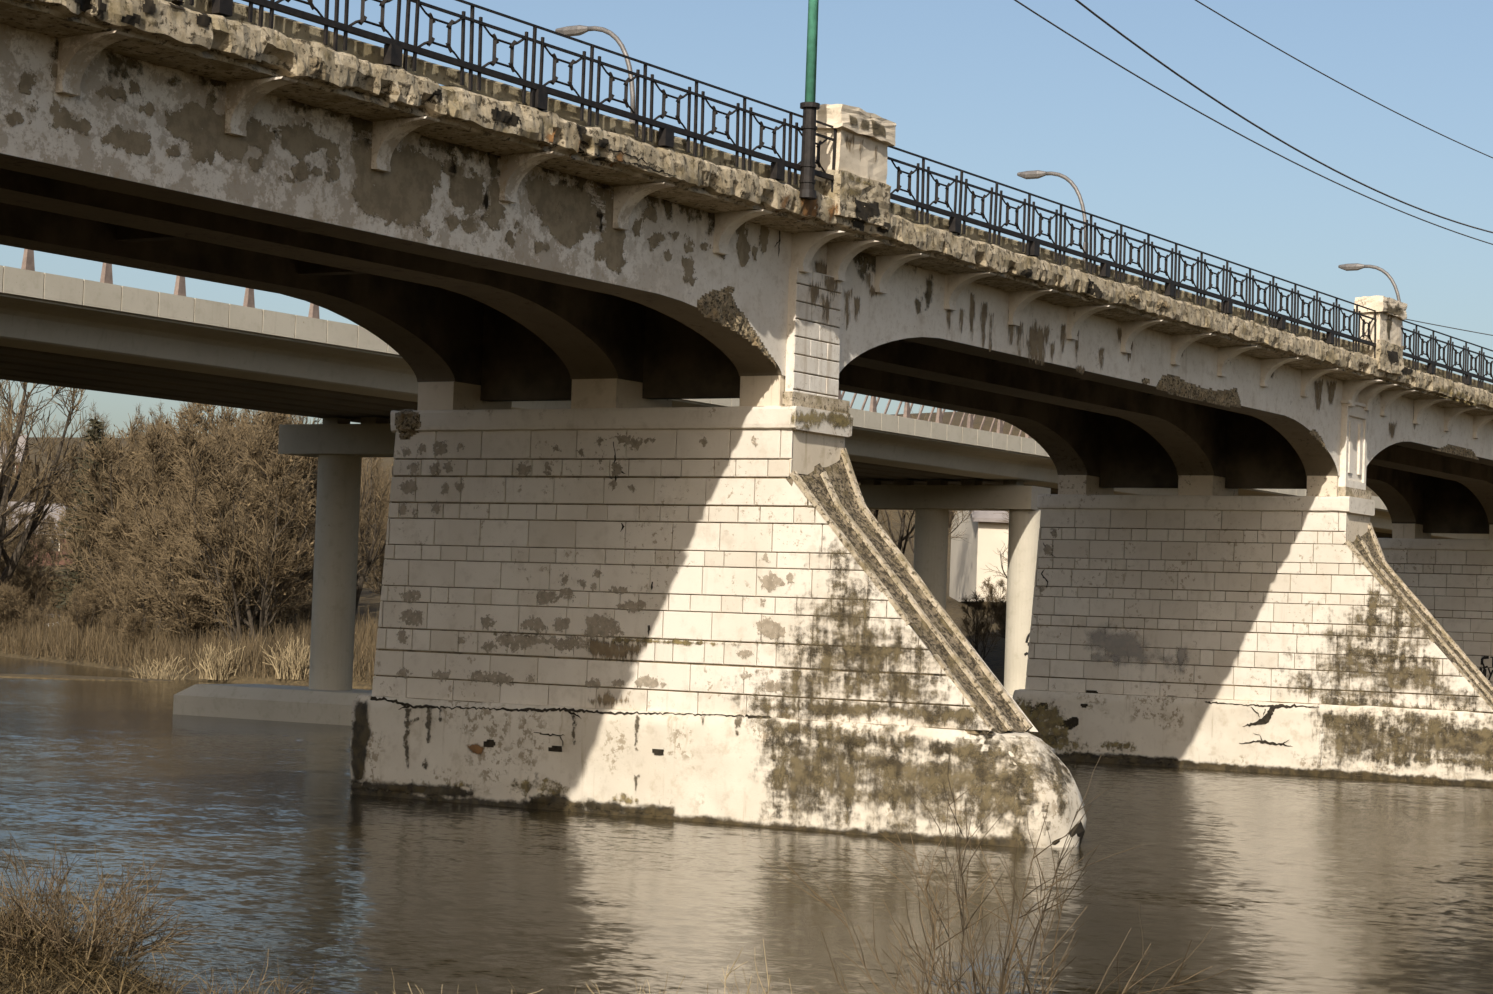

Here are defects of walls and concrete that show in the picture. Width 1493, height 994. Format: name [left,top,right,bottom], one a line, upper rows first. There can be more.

peeling [5,63,776,367]
spalling [1128,292,1170,312]
spalling [1142,374,1241,408]
peeling [397,587,423,645]
peeling [458,569,646,686]
damp [586,639,647,660]
damp [797,561,943,682]
damp [1349,590,1438,664]
peeling [585,674,666,689]
crack [370,696,772,747]
crack [1205,701,1319,747]
damp [1053,697,1493,814]